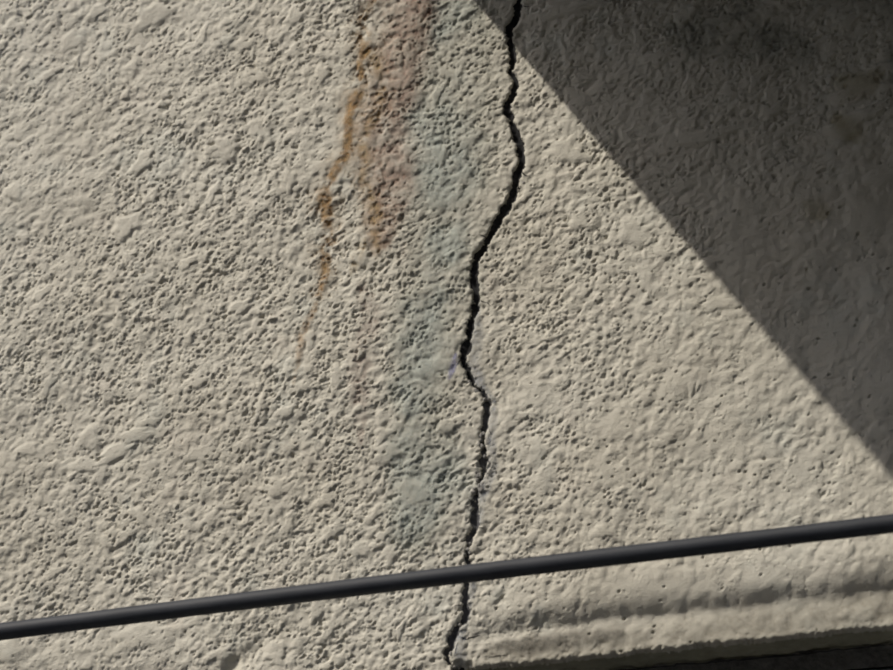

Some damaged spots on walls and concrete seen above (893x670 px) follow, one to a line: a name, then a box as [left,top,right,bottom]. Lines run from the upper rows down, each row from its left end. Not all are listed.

rust [329,92,362,179]
crack [443,0,529,670]
crack [620,643,893,670]